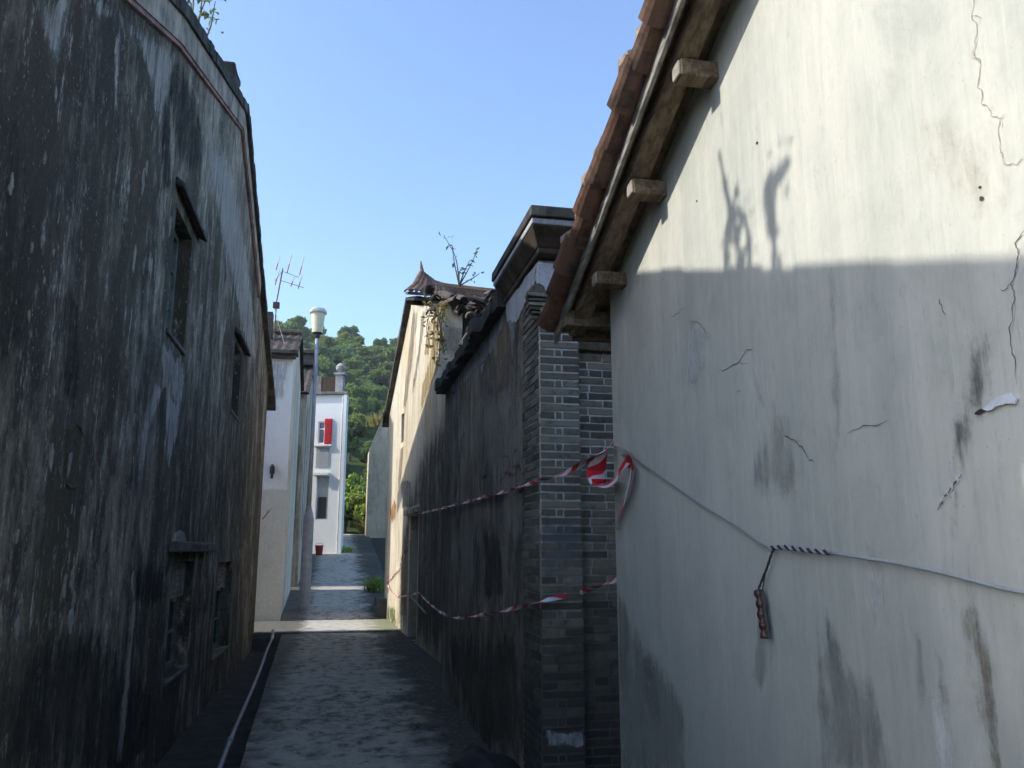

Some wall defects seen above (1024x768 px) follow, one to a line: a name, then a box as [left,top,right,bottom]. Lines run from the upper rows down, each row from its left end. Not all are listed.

leakage [163,62,201,187]
crack [971,2,1022,165]
crack [1002,232,1024,382]
leakage [139,373,183,479]
leakage [973,364,981,401]
peeling [975,393,1018,414]
crack [937,474,963,510]
leakage [8,563,163,768]